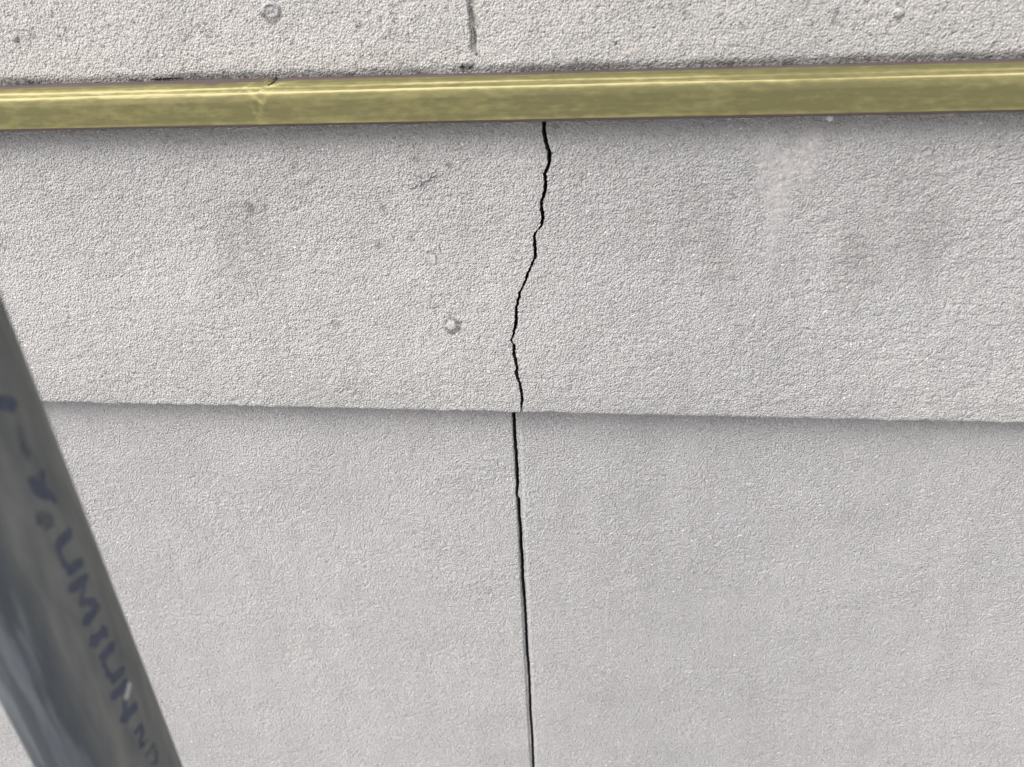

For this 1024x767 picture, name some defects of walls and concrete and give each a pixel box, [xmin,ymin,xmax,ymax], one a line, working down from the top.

crack [510,121,554,767]